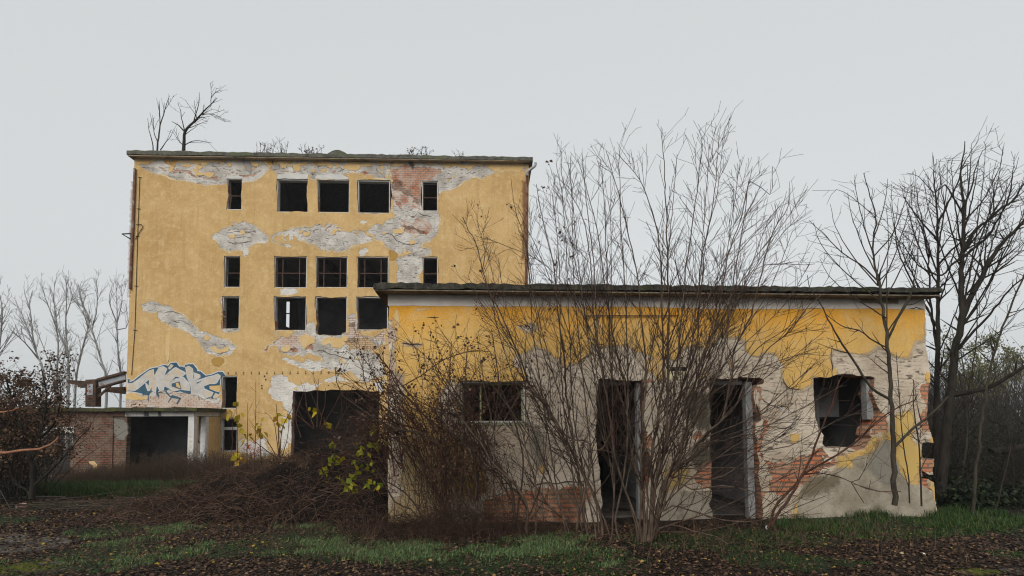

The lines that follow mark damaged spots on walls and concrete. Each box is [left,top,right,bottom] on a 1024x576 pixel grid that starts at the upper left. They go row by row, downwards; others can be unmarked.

flaking render [140,160,526,283]
flaking render [140,297,239,357]
flaking render [238,313,422,524]
flaking render [438,318,937,524]